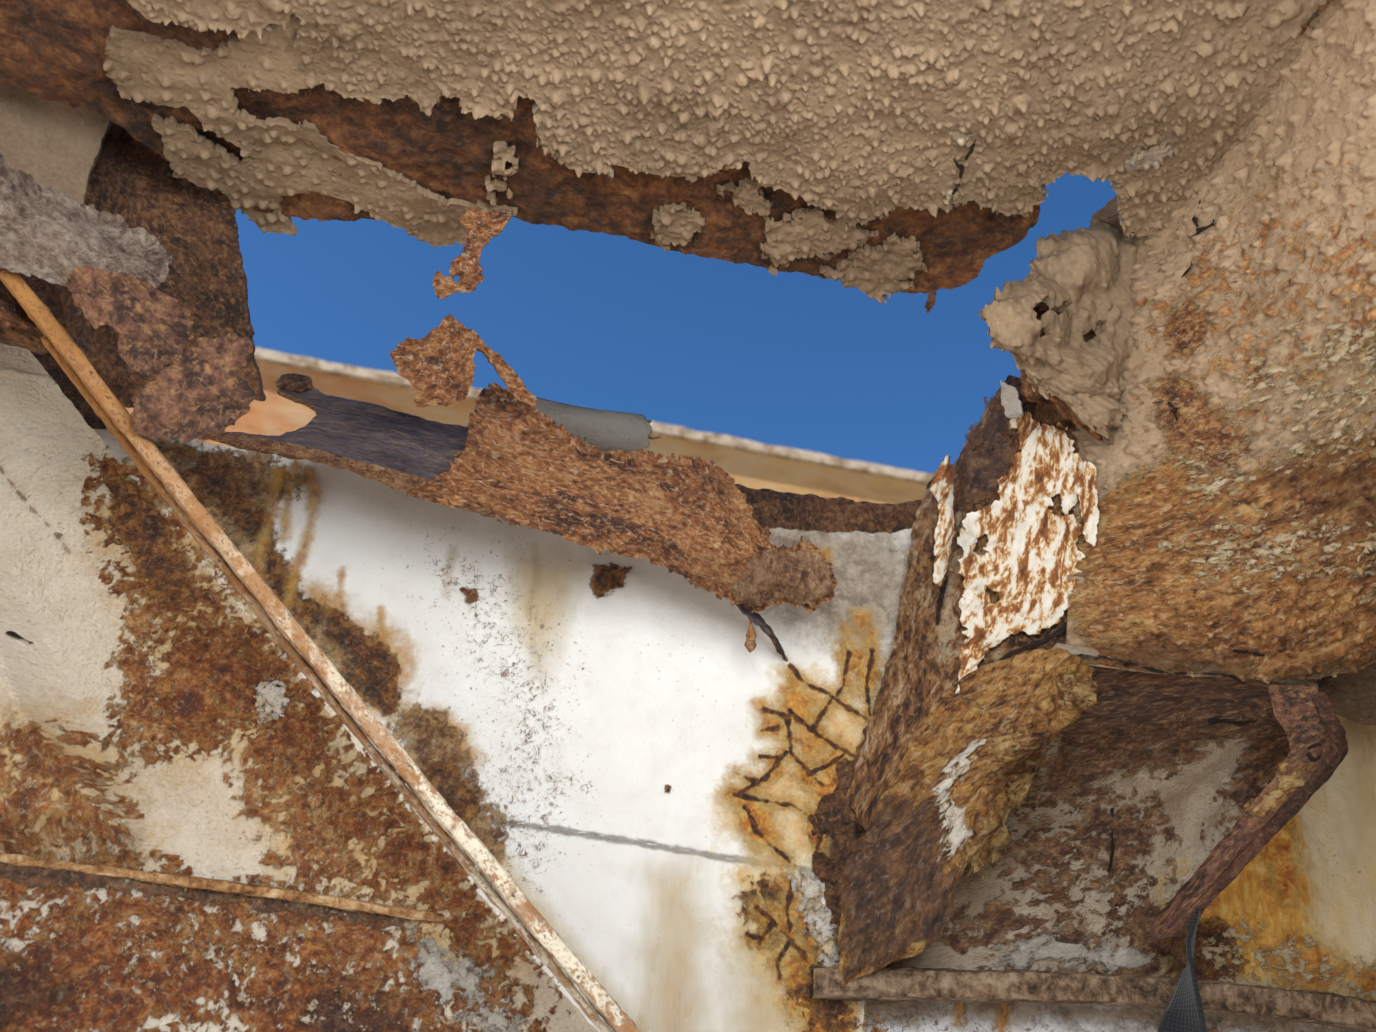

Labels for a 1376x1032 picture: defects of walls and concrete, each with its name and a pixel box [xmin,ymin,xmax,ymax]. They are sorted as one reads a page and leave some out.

corrosion [0,282,48,355]
corrosion [0,0,243,163]
corrosion [0,445,571,1032]
corrosion [66,265,517,865]
corrosion [234,83,1040,408]
crack [724,644,878,982]
peeling [943,187,962,205]
peeling [948,130,972,146]
peeling [930,217,1138,694]
corrosion [723,140,1376,1032]